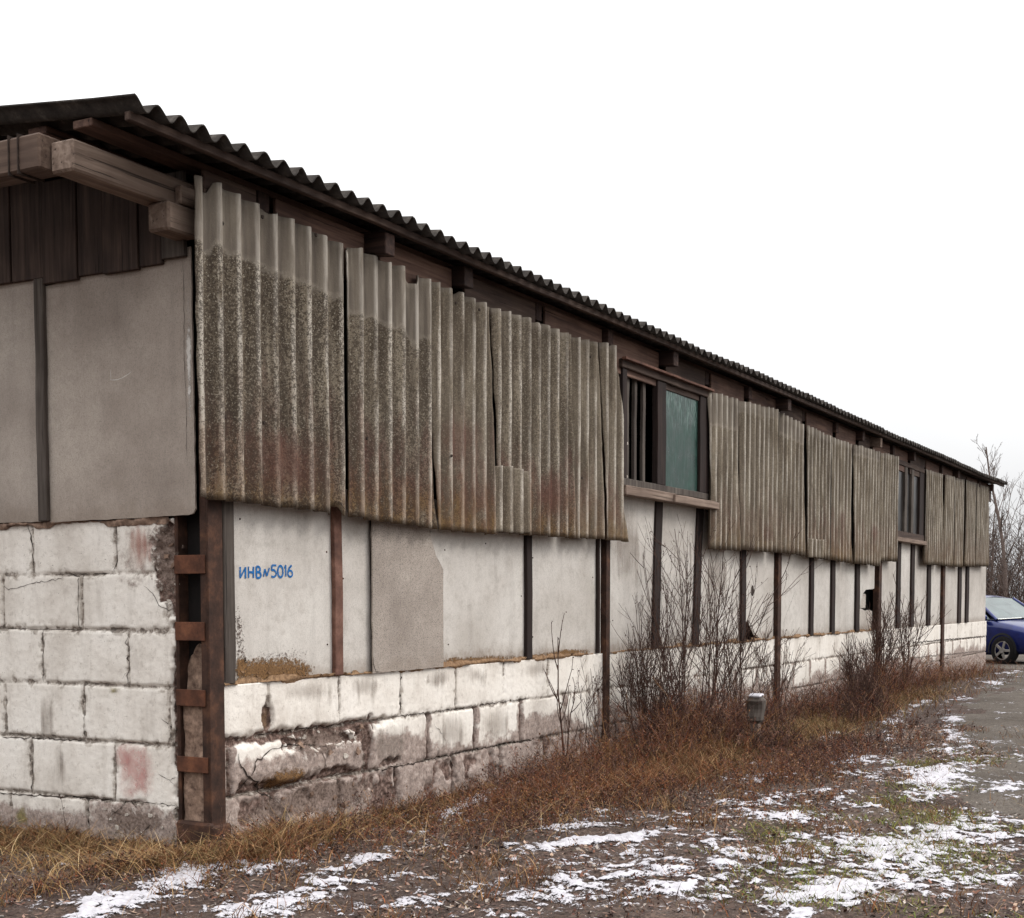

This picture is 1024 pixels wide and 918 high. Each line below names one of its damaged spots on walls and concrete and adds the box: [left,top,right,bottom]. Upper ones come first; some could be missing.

spalling [147,520,183,604]
crack [236,725,332,799]
spalling [281,724,365,759]
peeling [101,800,178,835]
spalling [241,779,376,822]